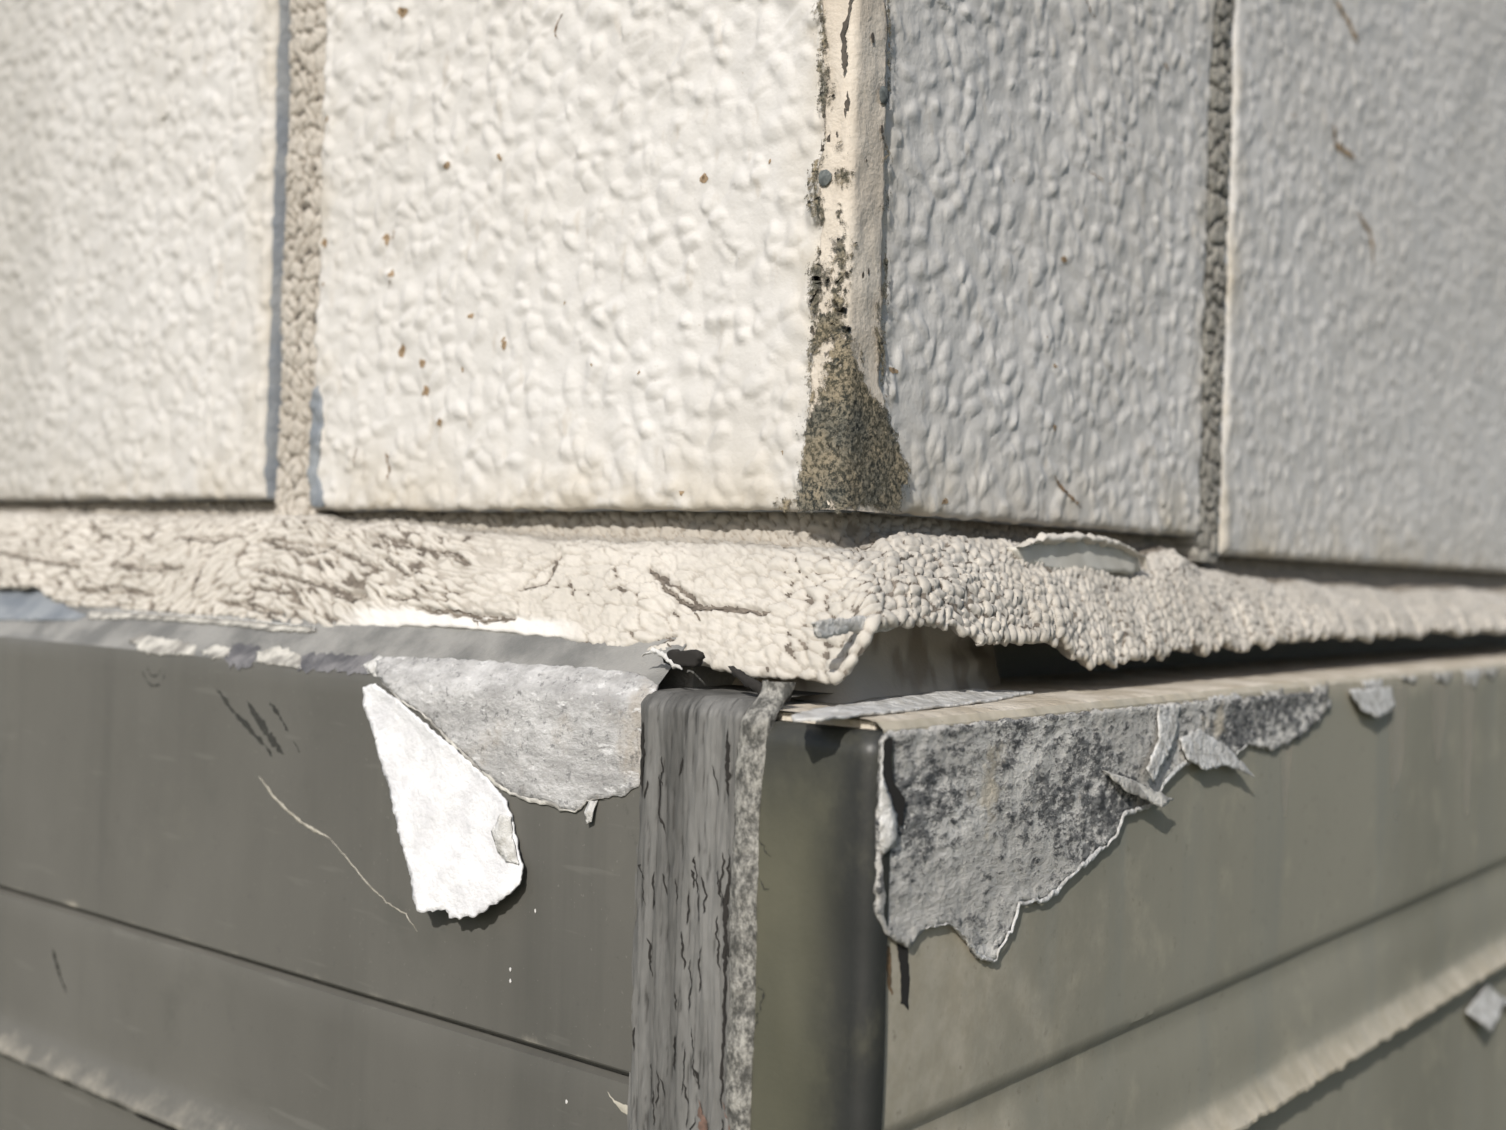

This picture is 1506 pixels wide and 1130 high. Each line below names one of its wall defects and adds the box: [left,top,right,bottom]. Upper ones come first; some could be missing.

crack [294,12,320,129]
crack [840,0,852,115]
leakage [773,0,911,523]
crack [0,164,1321,680]
peeling [362,655,659,920]
peeling [873,682,1332,963]
peeling [1348,667,1499,719]
peeling [1466,984,1506,1032]